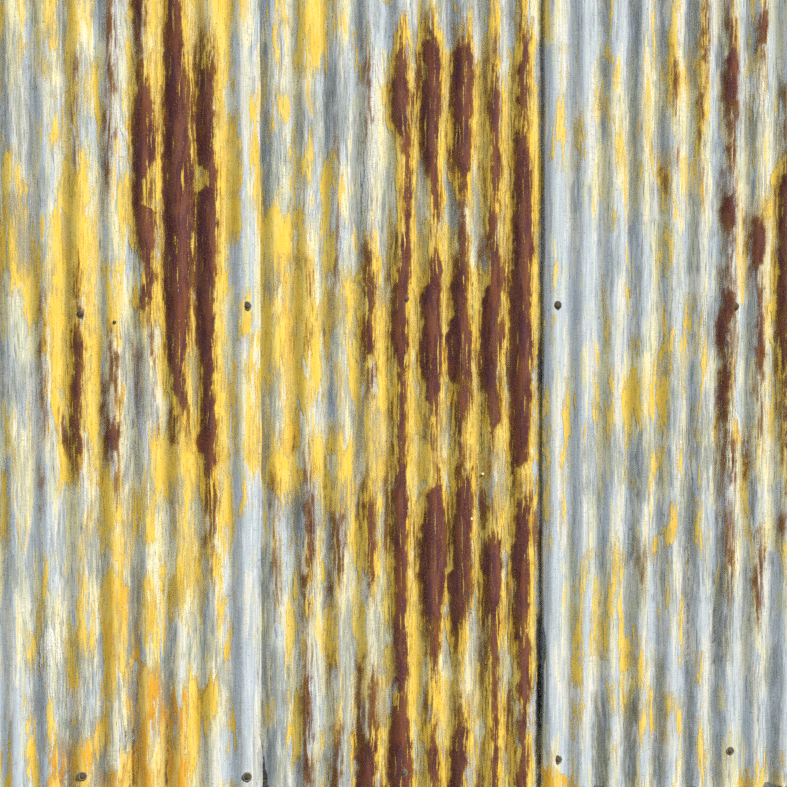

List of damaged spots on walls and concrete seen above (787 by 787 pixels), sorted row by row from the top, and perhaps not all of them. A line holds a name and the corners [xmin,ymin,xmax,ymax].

peeling [0,135,125,556]
rust [62,281,121,474]
rust [125,0,226,548]
peeling [24,0,394,787]
rust [328,513,345,597]
rust [331,8,541,787]
peeling [408,598,464,744]
peeling [463,85,588,528]
peeling [571,537,684,755]
peeling [584,296,703,485]
rust [715,3,787,495]
rust [752,540,766,619]